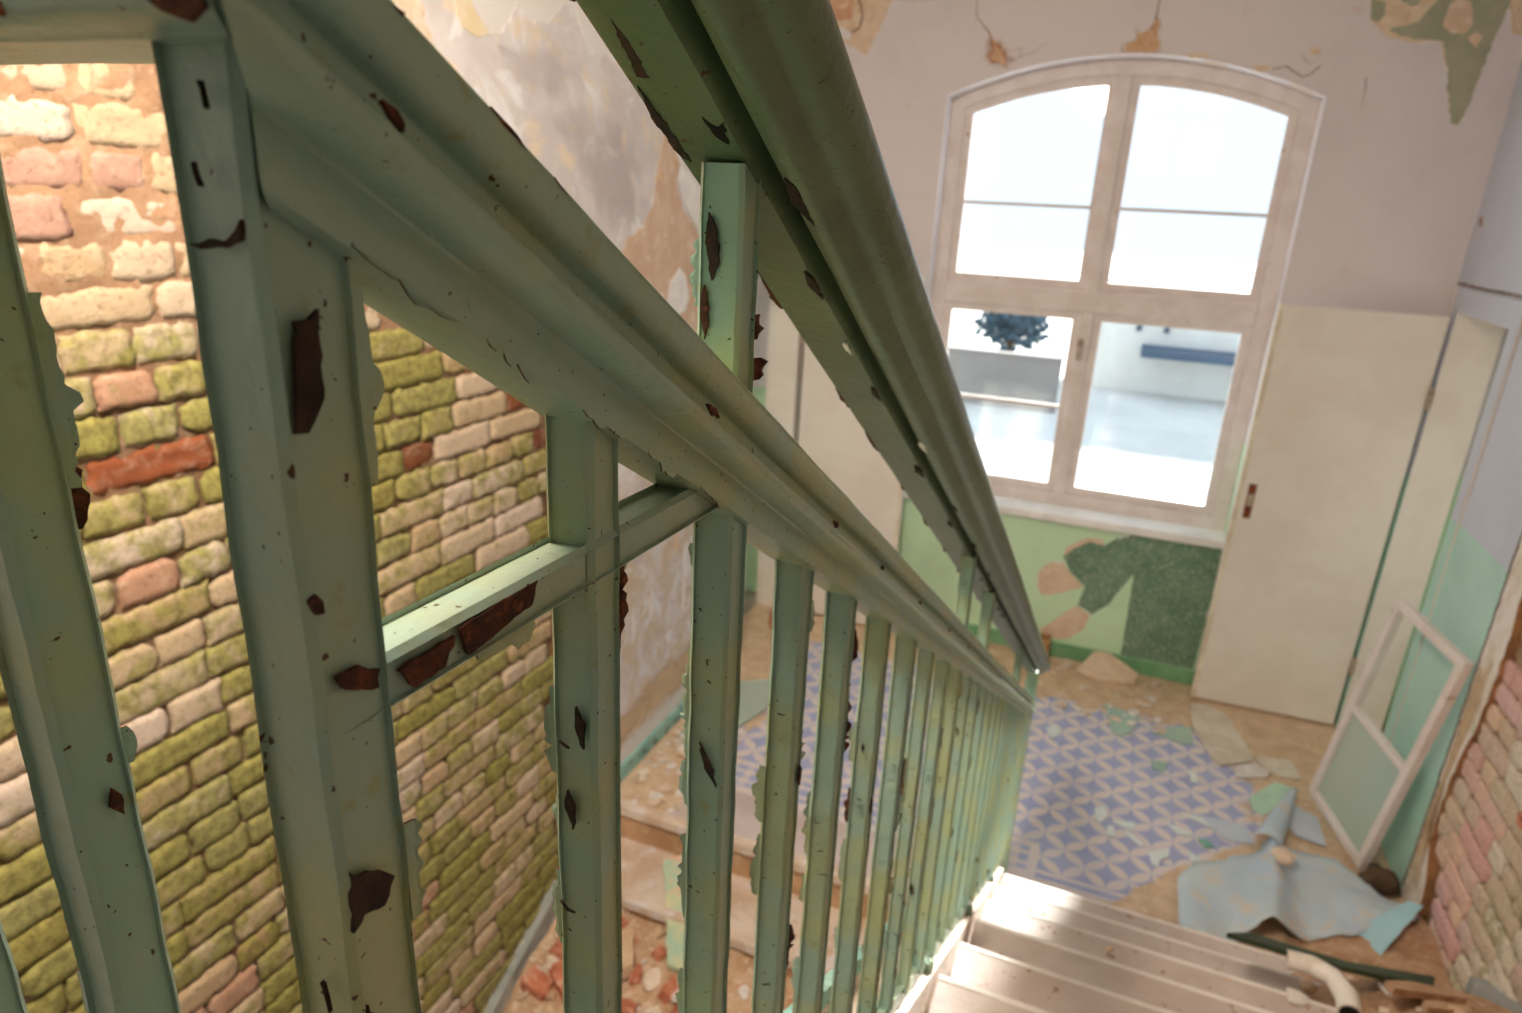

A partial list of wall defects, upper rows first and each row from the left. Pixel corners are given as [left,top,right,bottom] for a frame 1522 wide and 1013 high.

flaking render [830,0,892,55]
crack [976,0,1049,67]
flaking render [1370,0,1522,125]
peeling [392,0,701,333]
flaking render [351,286,548,618]
flaking render [0,63,303,1013]
rust [332,580,538,690]
flaking render [1037,535,1222,669]
flaking render [391,610,562,1013]
flaking render [1427,641,1522,1006]
rust [348,870,395,934]